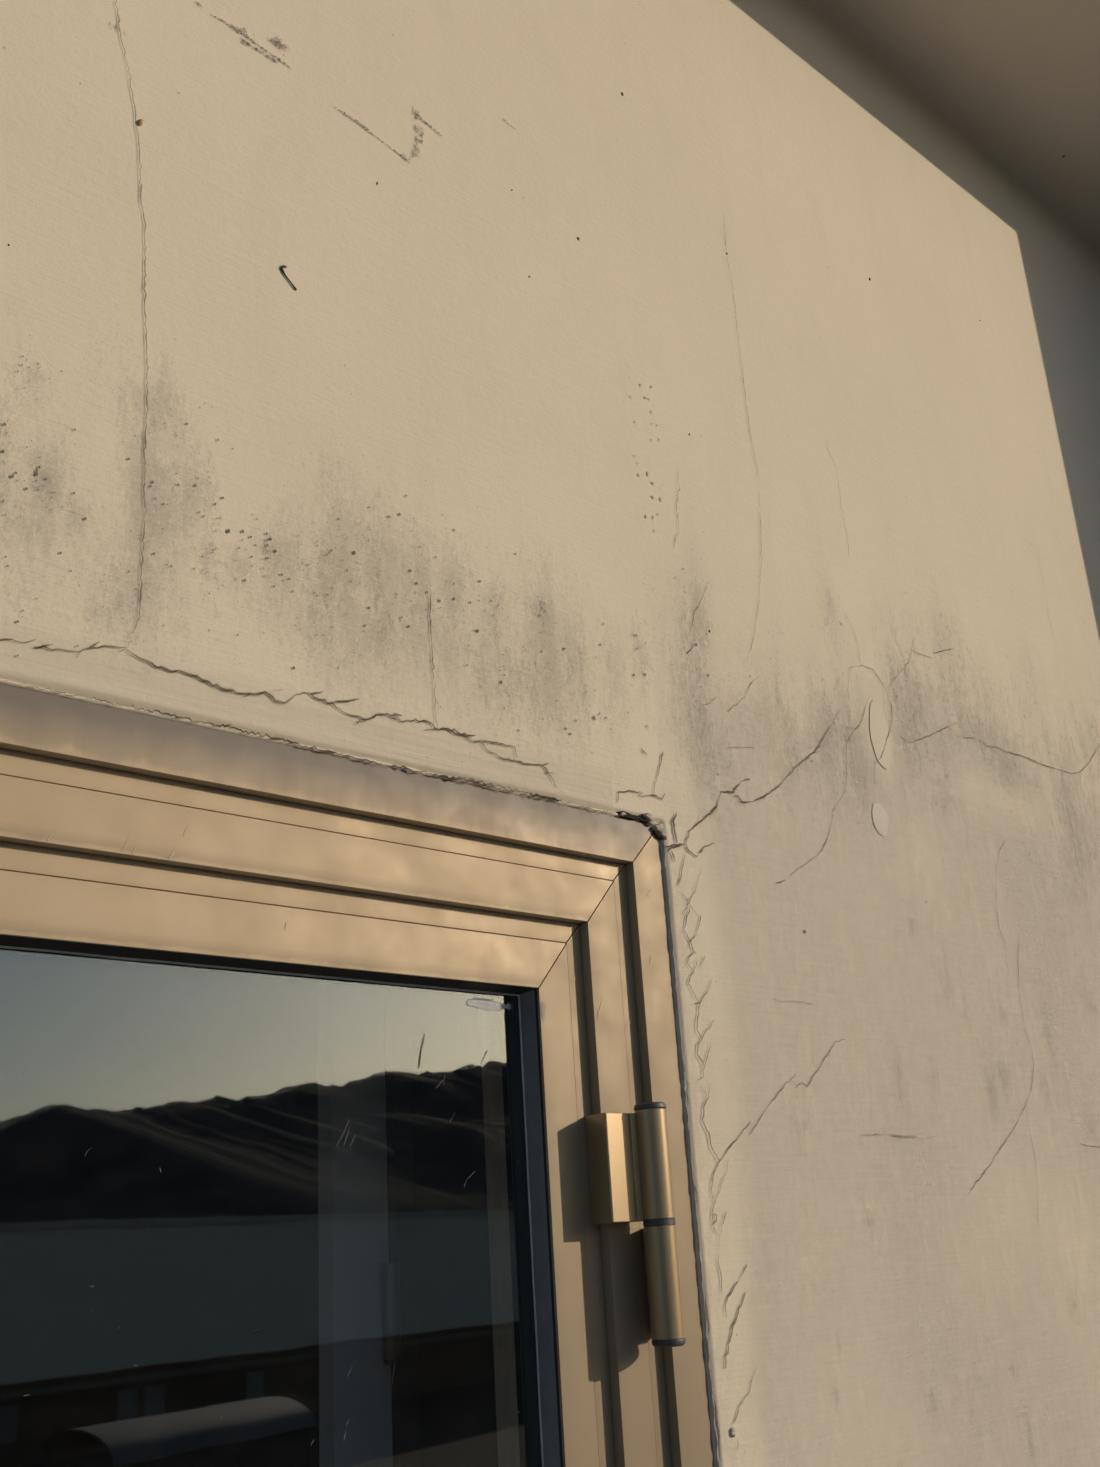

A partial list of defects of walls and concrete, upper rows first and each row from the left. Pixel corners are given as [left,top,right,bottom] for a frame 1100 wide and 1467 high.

crack [115,0,147,354]
leakage [2,420,87,528]
leakage [128,458,615,746]
crack [0,385,1100,1449]